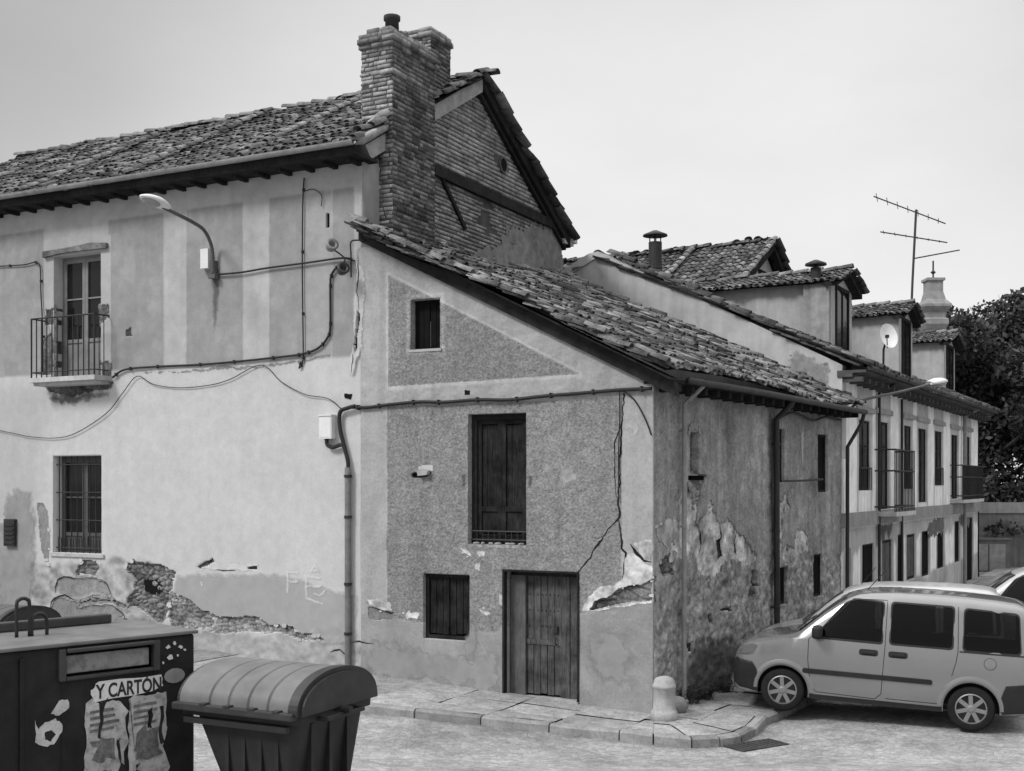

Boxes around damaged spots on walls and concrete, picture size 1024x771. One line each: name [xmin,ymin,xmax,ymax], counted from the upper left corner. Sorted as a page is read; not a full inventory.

crack [577,393,625,572]
flaking render [37,503,51,568]
flaking render [582,470,761,612]
flaking render [780,491,809,567]
spalling [50,558,325,641]
flaking render [367,598,419,621]